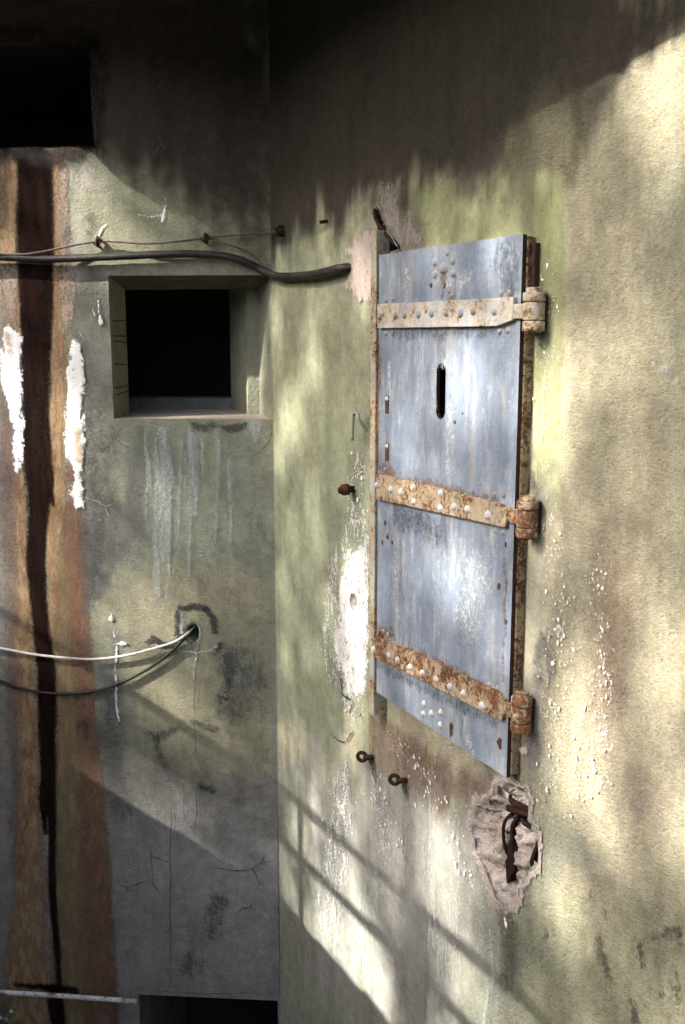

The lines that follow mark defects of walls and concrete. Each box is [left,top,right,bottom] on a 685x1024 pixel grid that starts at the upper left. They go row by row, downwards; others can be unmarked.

peeling [344,182,425,303]
rust [0,147,118,1024]
damp [146,423,261,596]
peeling [317,451,369,726]
peeling [536,495,615,818]
crack [117,783,280,997]
spalling [387,731,556,921]